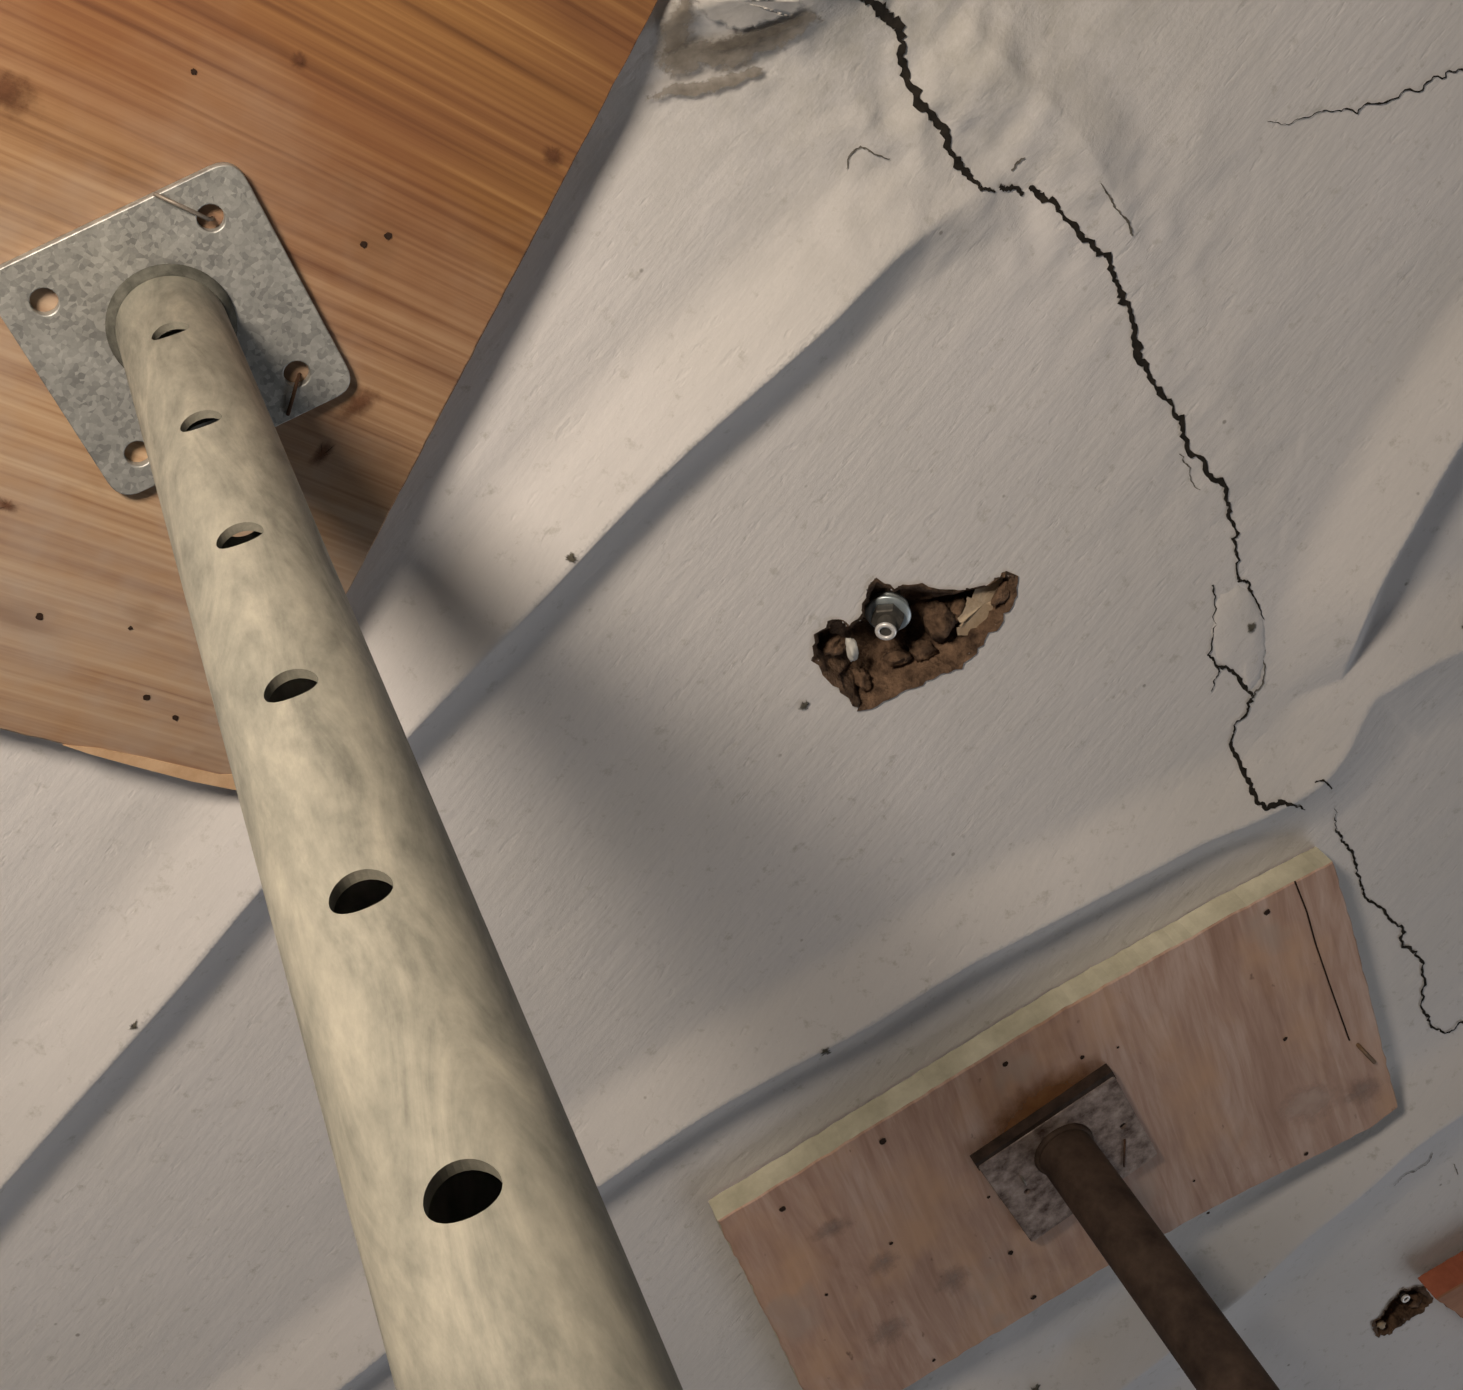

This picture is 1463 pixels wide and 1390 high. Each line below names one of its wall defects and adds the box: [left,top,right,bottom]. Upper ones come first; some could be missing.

flaking render [696,0,800,30]
crack [846,146,890,169]
crack [860,0,1463,1041]
flaking render [811,571,1018,711]
flaking render [1372,1286,1433,1338]